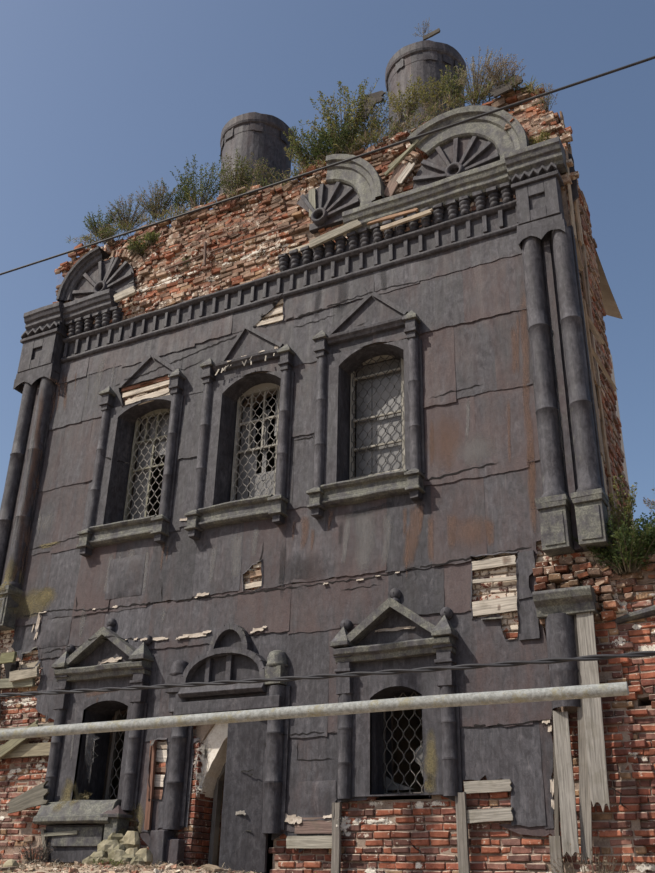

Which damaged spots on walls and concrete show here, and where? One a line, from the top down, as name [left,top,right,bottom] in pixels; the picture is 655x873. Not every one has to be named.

peeling [222,244,290,266]
peeling [137,271,218,292]
peeling [253,293,285,328]
crack [288,281,419,327]
peeling [120,371,174,407]
crack [426,462,498,481]
peeling [242,559,264,592]
crack [14,547,530,633]
peeling [470,551,520,642]
peeling [193,740,211,796]